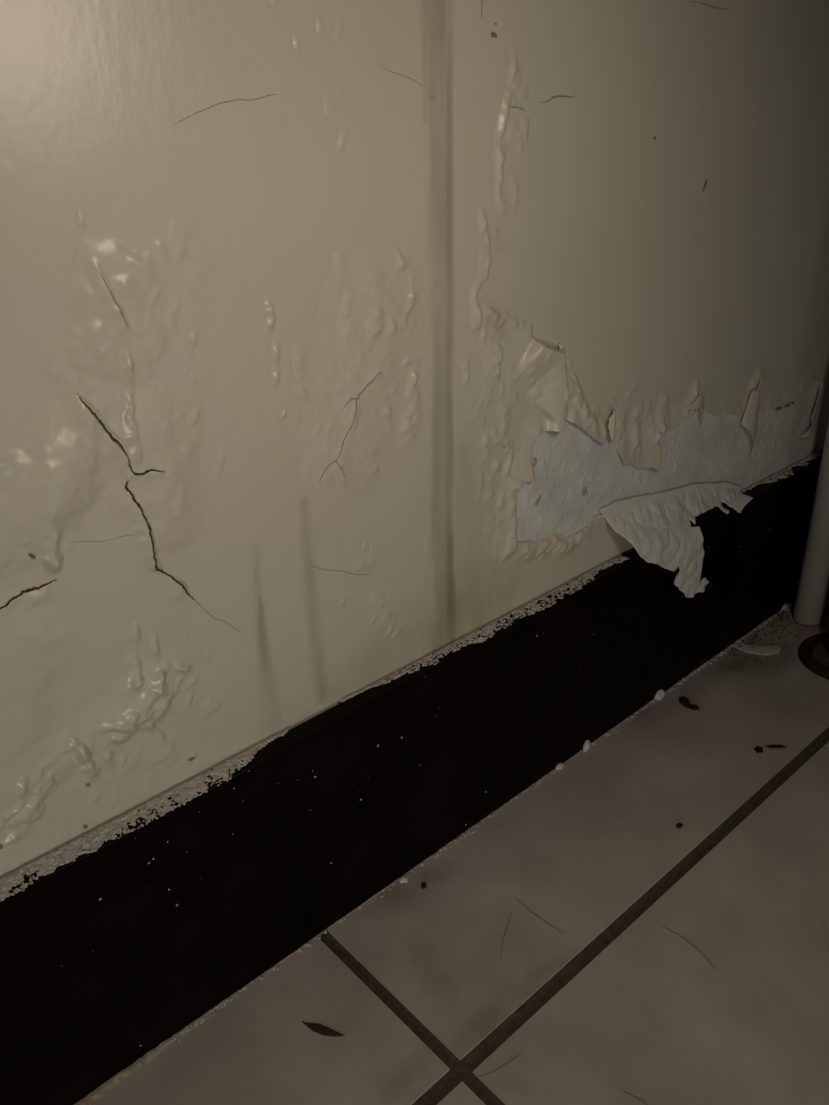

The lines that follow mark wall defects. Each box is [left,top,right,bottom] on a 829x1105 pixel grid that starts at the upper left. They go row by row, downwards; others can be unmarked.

crack [174,94,276,125]
crack [319,372,383,482]
peeling [459,299,829,598]
crack [77,393,240,632]
crack [0,580,56,610]